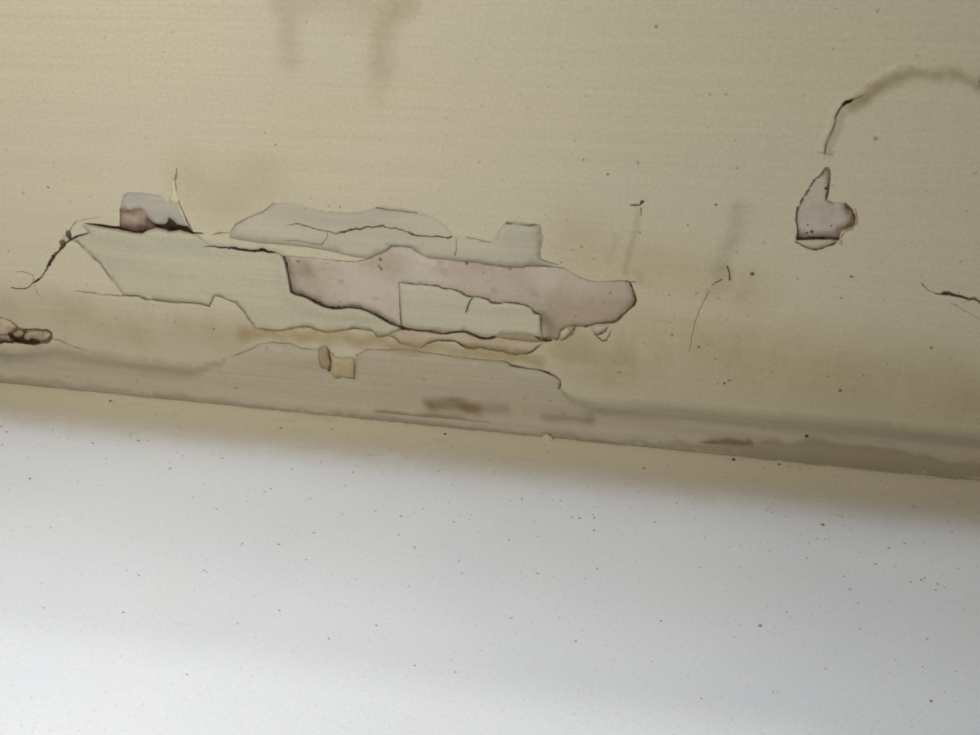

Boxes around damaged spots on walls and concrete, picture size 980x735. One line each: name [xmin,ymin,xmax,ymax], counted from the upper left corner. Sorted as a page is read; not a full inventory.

peeling [795,167,858,251]
peeling [0,317,89,351]
crack [11,217,101,298]
peeling [318,346,355,379]
peeling [84,168,637,356]
crack [921,283,980,320]